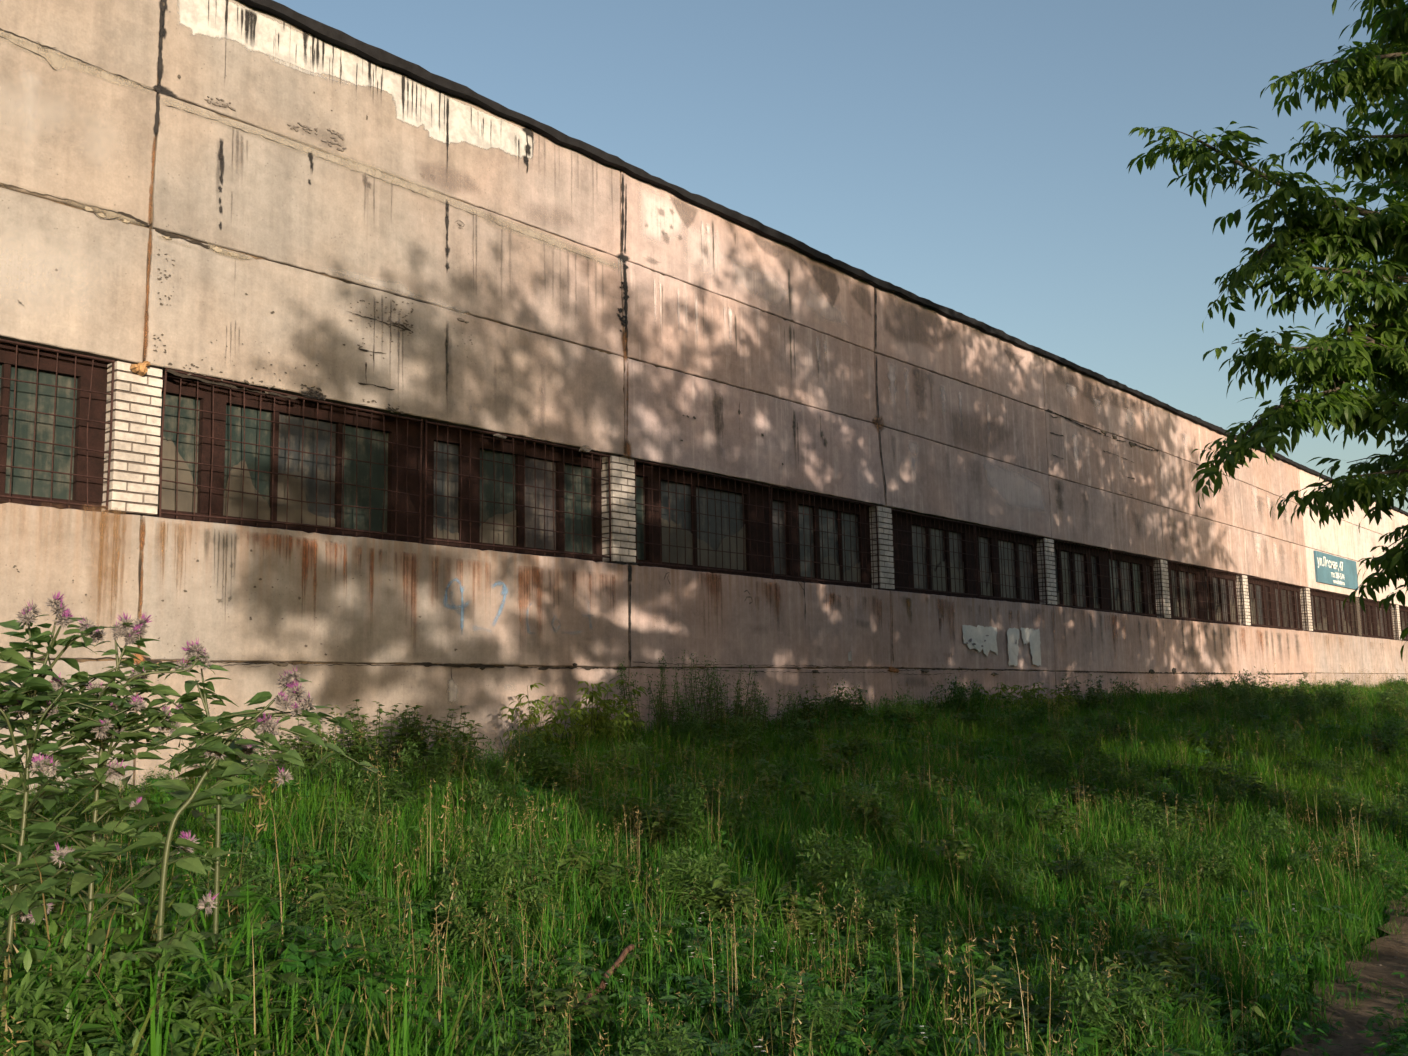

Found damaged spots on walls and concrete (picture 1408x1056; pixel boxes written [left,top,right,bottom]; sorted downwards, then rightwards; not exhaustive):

crack [0,28,153,91]
peeling [163,0,534,159]
crack [1,183,149,224]
water stain [219,137,243,229]
water stain [343,273,413,357]
water stain [621,176,721,356]
water stain [724,308,737,346]
water stain [736,262,841,319]
water stain [875,293,956,500]
water stain [1007,352,1023,366]
corrosion [100,514,145,634]
corrosion [274,536,327,591]